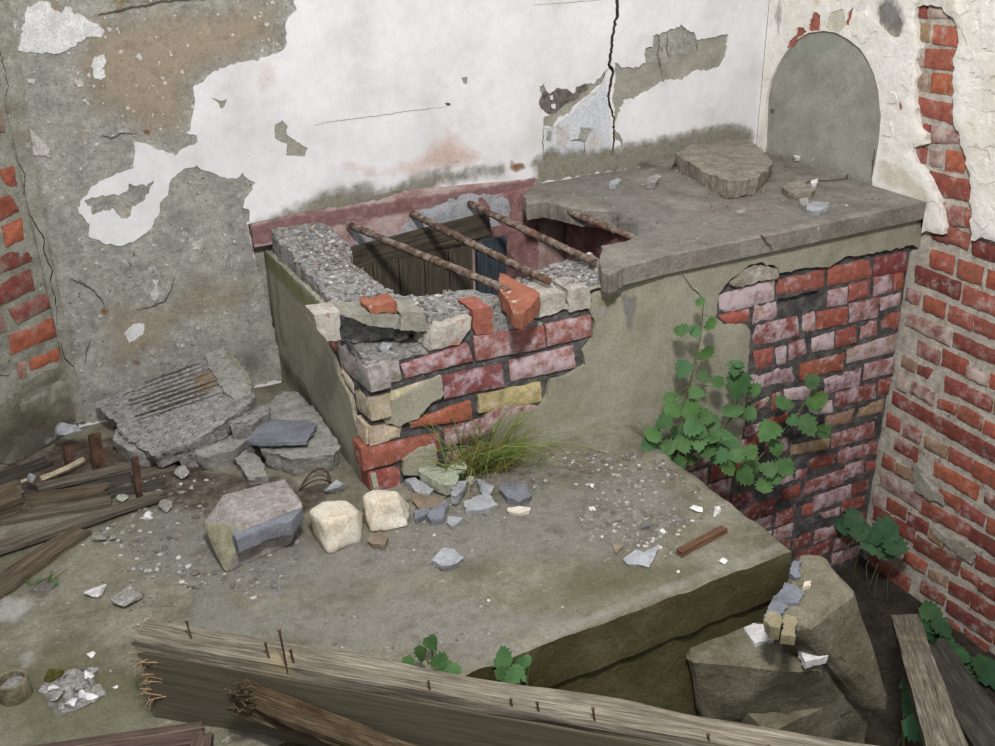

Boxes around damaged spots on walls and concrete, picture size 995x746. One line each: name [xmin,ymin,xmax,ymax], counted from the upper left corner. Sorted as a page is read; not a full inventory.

peeling [9,0,296,425]
peeling [274,120,307,156]
crack [596,0,623,150]
spalling [539,25,728,159]
crack [32,220,73,366]
flaking render [305,272,592,491]
flaking render [670,0,995,655]